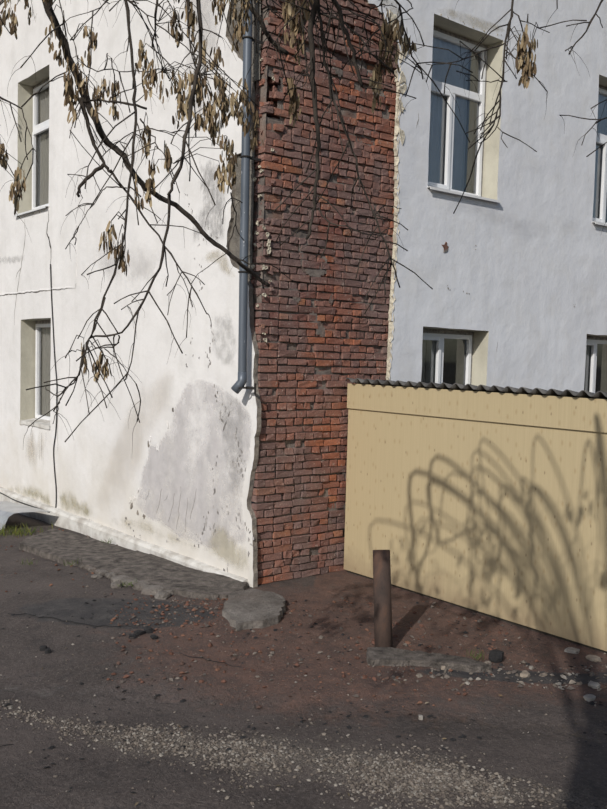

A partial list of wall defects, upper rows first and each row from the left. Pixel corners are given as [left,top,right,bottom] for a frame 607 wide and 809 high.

spalling [194,0,408,585]